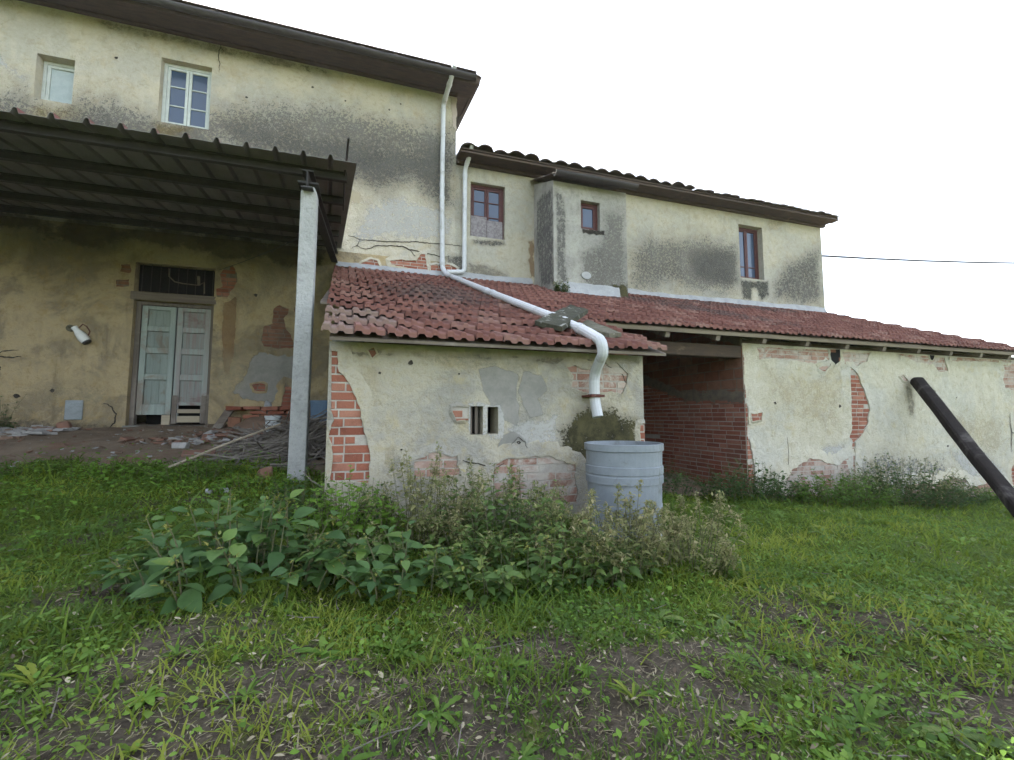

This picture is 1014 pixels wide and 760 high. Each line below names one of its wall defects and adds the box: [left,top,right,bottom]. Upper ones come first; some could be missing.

leakage [0,56,462,241]
crack [348,235,459,257]
flaking render [359,250,459,276]
leakage [537,188,567,285]
leakage [578,214,824,304]
flaking render [233,293,296,411]
flaking render [324,343,386,498]
flaking render [400,366,588,519]
flaking render [556,329,875,496]
flaking render [898,354,1014,398]